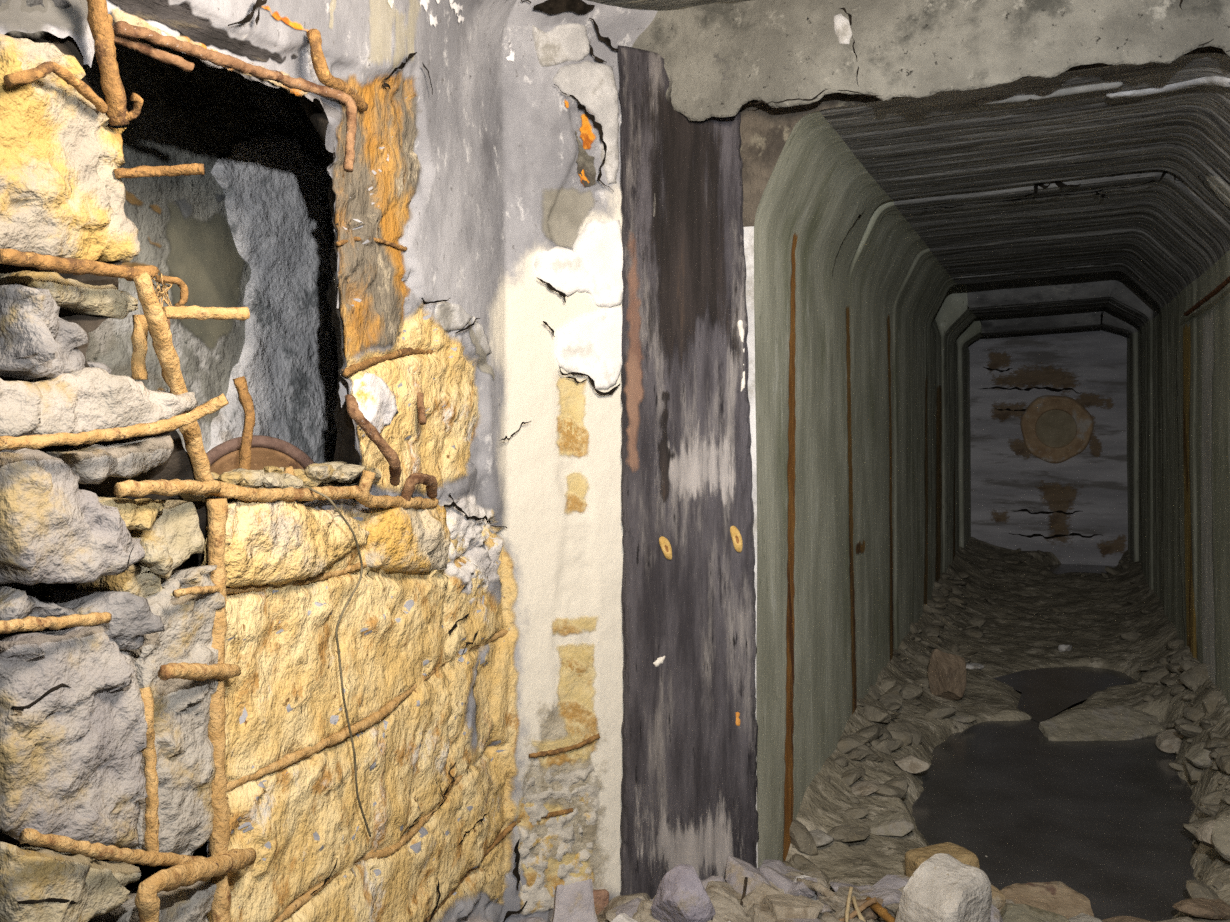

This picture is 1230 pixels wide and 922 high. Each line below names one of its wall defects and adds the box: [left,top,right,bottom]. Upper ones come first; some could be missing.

spalling [3,0,368,172]
peeling [532,23,619,187]
crack [749,3,879,104]
peeling [0,132,508,922]
rust [332,71,479,495]
crack [536,277,568,337]
peeling [534,219,623,389]
crack [559,367,620,395]
damp [658,391,673,502]
damp [642,85,739,365]
rust [783,234,798,861]
rust [224,526,598,922]